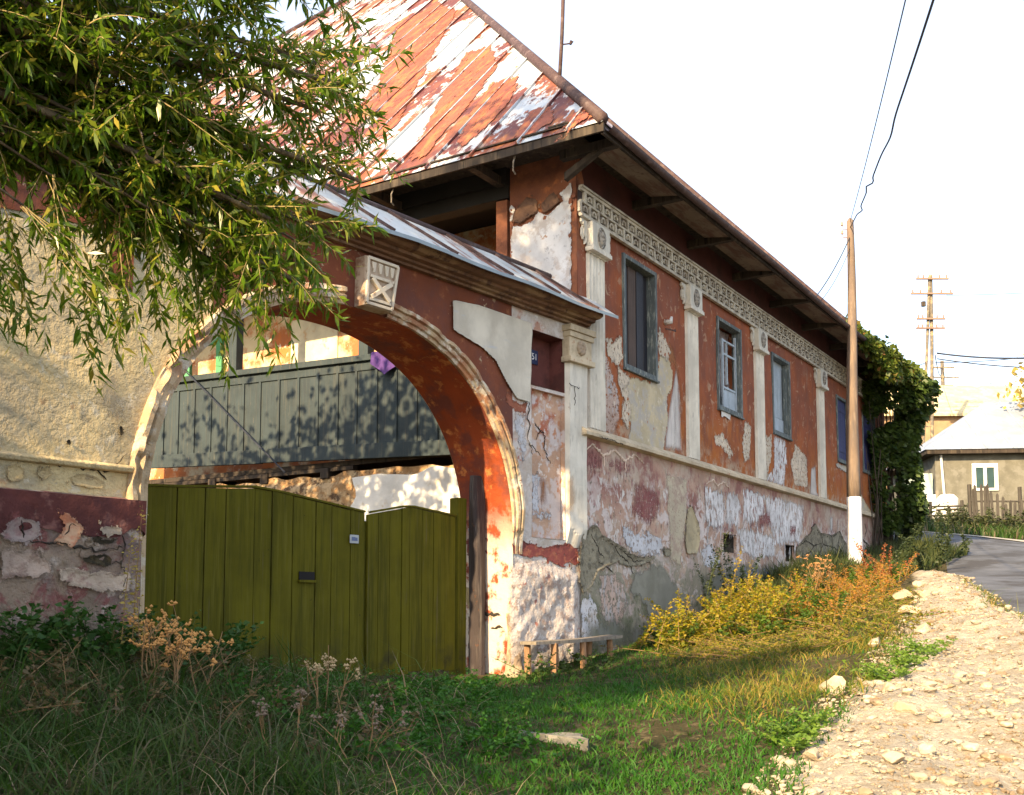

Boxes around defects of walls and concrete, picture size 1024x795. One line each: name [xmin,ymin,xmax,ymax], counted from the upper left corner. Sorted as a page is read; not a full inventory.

corrosion [374,1,458,137]
corrosion [408,45,519,161]
corrosion [512,106,592,145]
peeling [510,183,576,290]
crack [527,403,551,464]
peeling [605,327,673,450]
peeling [0,512,131,598]
spalling [512,471,847,637]